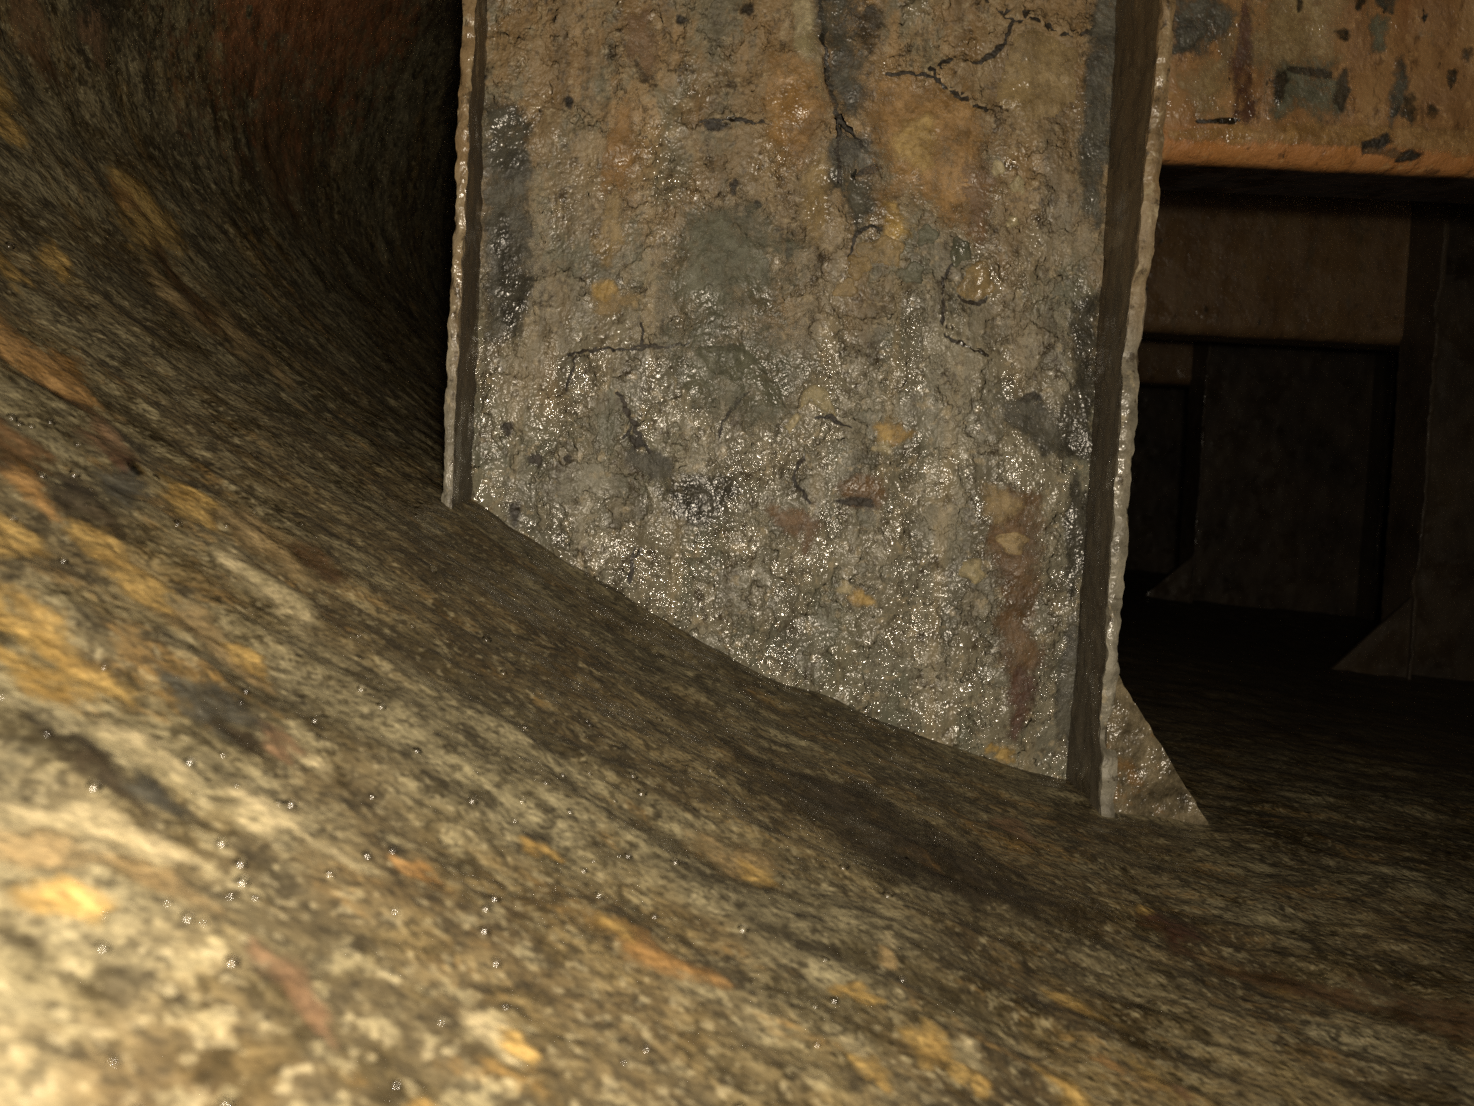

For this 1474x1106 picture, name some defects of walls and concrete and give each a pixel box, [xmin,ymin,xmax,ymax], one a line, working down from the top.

leakage [817,0,883,229]
crack [885,0,1095,112]
leakage [665,205,805,430]
leakage [626,447,737,526]
leakage [1055,296,1099,595]
corrosion [983,483,1044,764]
leakage [1055,617,1078,740]